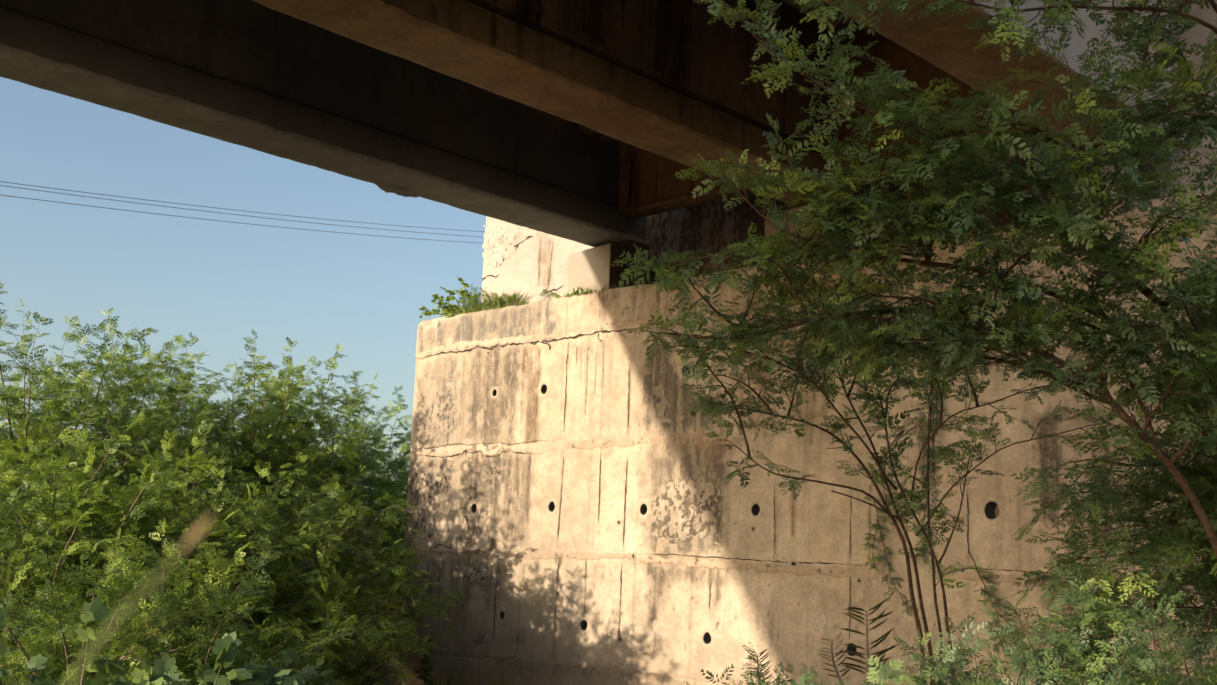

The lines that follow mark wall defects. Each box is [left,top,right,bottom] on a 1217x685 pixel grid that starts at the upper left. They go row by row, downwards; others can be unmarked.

leakage [420,303,555,540]
leakage [643,345,726,621]